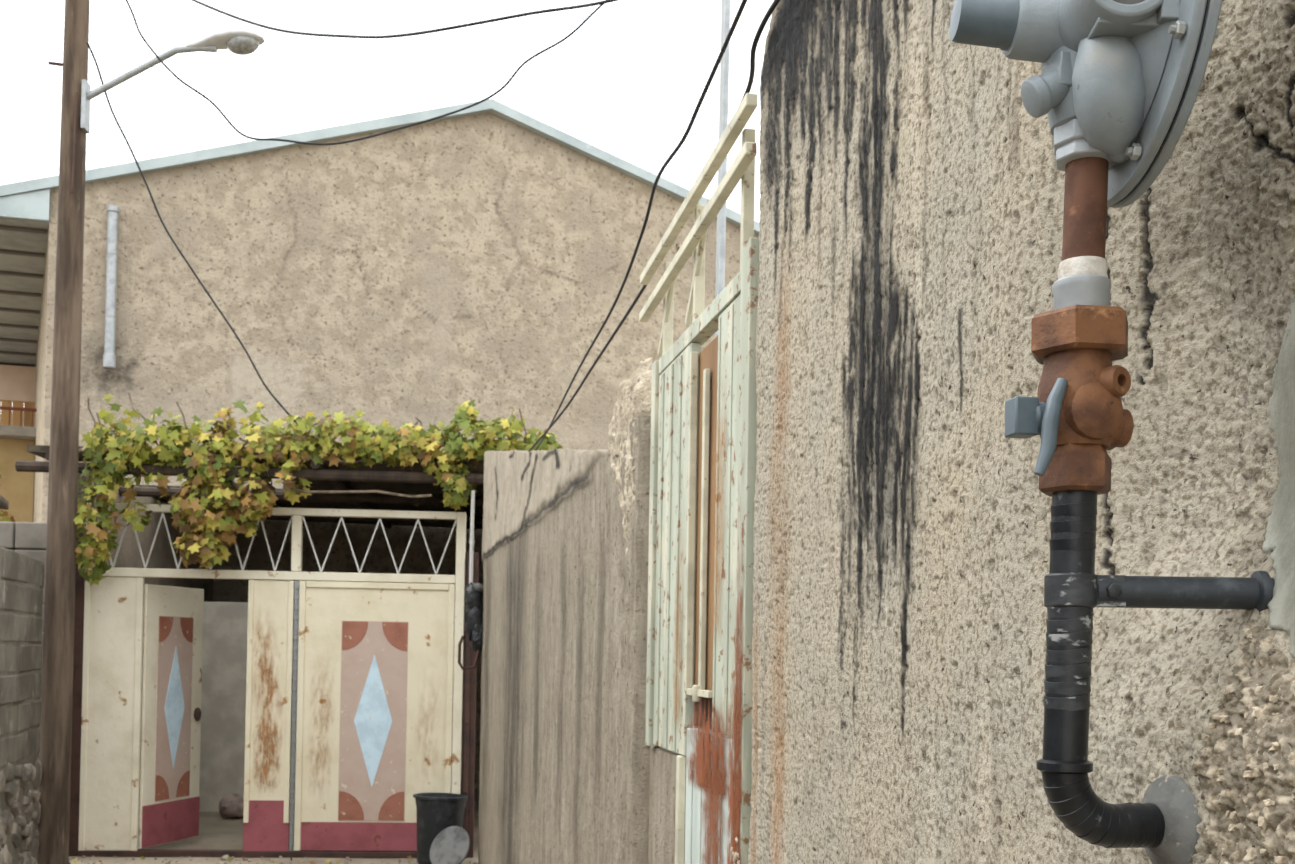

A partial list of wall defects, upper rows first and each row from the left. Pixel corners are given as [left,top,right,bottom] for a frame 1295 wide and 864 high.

crack [1245,75,1295,163]
peeling [608,358,652,554]
leakage [760,0,920,736]
corrosion [258,633,277,782]
corrosion [688,589,742,864]